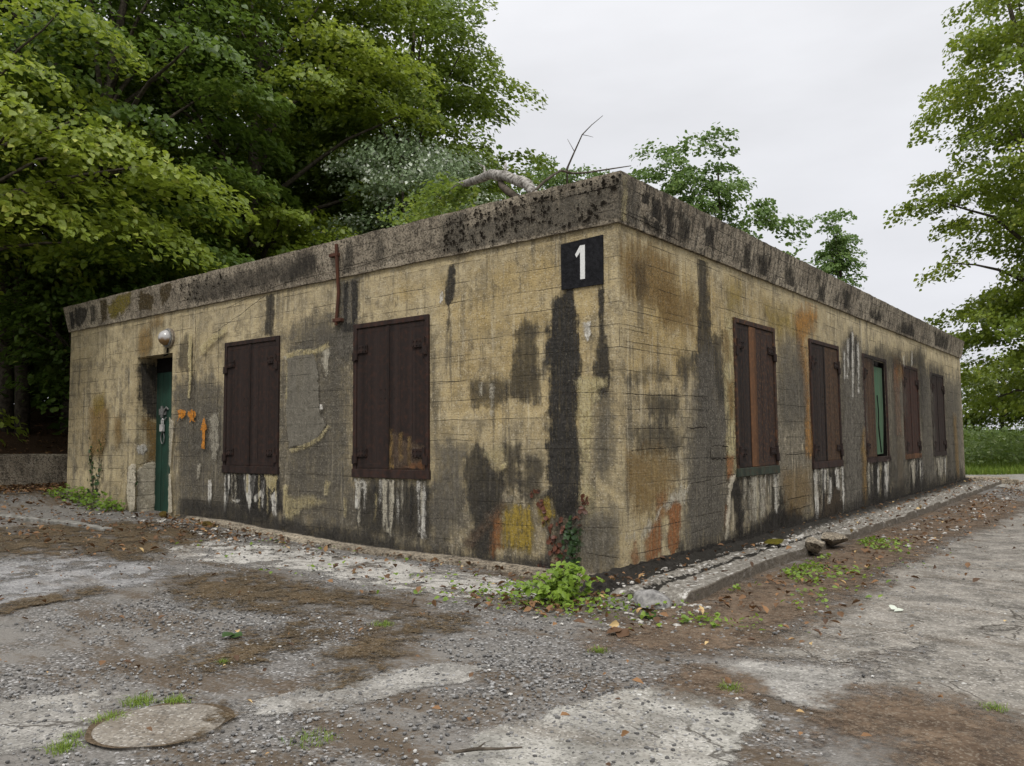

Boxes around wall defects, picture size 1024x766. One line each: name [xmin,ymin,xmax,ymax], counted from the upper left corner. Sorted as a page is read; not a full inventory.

leakage [621,175,689,240]
leakage [705,226,715,248]
leakage [742,244,770,276]
leakage [175,259,967,574]
corrosion [632,501,682,565]